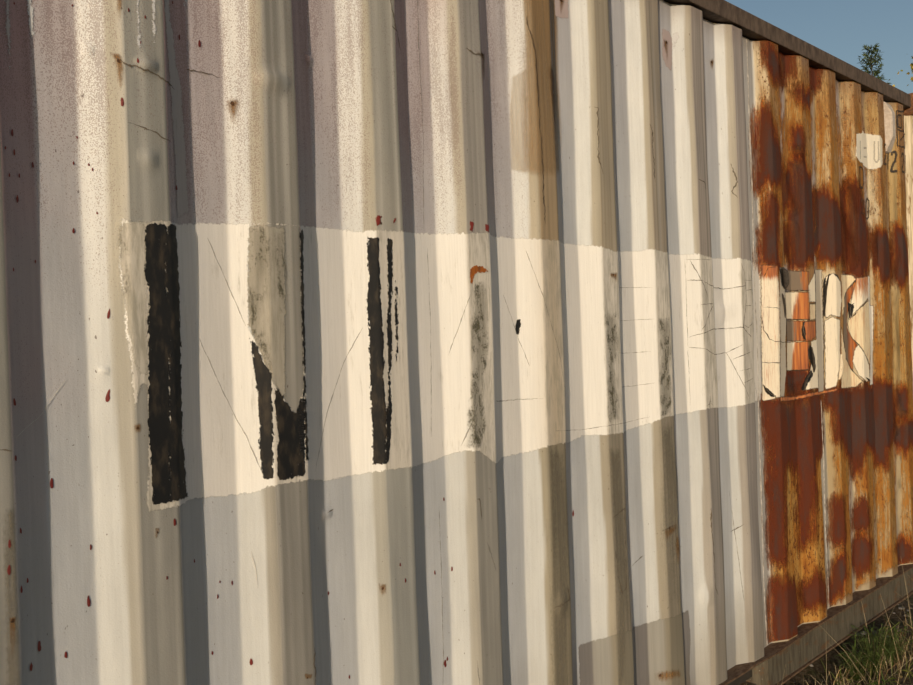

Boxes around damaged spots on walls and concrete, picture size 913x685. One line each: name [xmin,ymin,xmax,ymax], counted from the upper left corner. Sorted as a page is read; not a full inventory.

crack [526,18,545,219]
leakage [469,285,487,445]
leakage [607,319,617,417]
leakage [660,320,671,415]
crack [685,259,869,396]
rust [749,40,913,644]